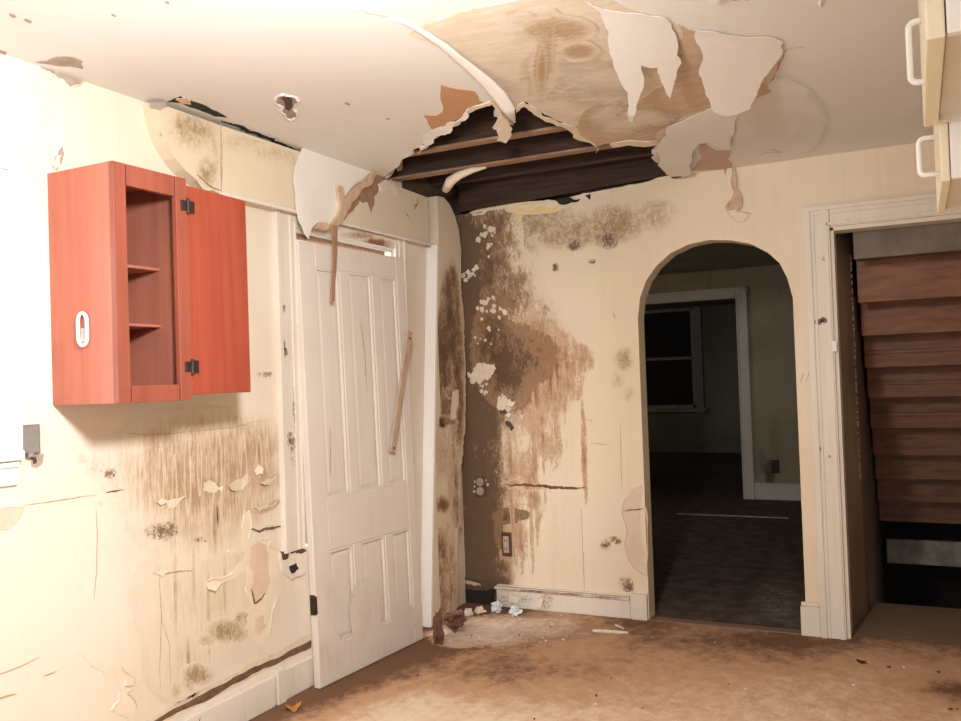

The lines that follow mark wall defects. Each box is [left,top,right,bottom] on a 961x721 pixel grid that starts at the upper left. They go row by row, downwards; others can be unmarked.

flaking render [36,56,84,89]
leakage [160,110,299,193]
peeling [151,93,642,301]
peeling [386,0,783,224]
leakage [504,3,680,137]
leakage [438,196,682,610]
crack [29,490,121,596]
leakage [76,387,296,708]
flaking render [146,500,311,721]
peeling [203,465,277,493]
crack [500,479,587,491]
crack [0,657,56,699]